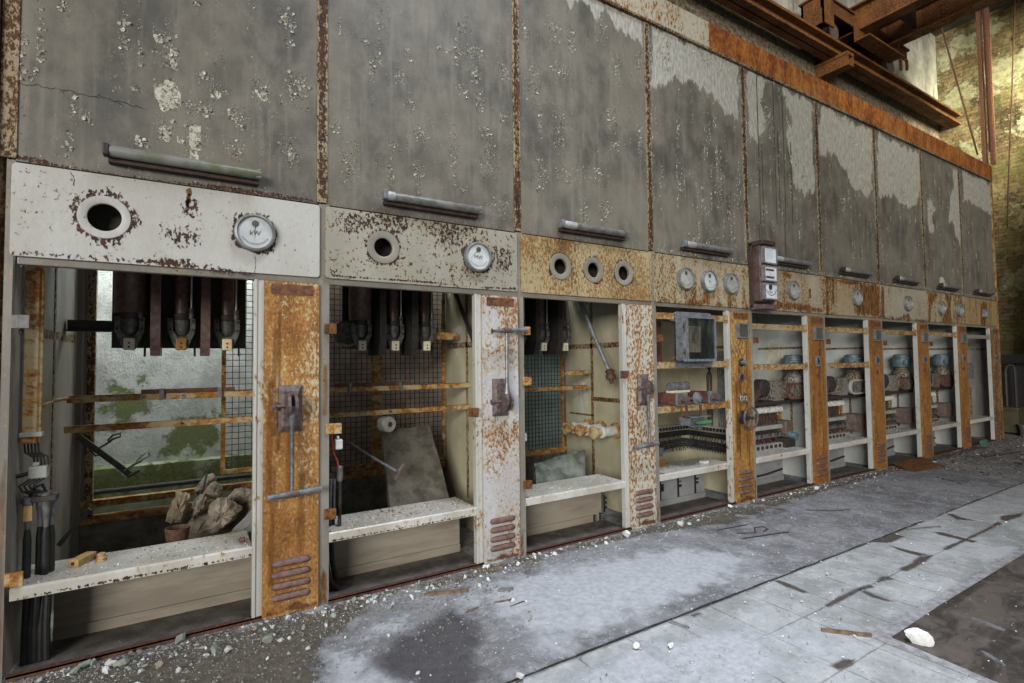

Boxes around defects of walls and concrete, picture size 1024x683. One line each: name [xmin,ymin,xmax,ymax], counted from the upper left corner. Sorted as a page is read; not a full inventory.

crack [20,83,145,109]
rust [12,0,328,276]
peeling [117,1,311,161]
rust [512,0,521,228]
rust [547,251,634,286]
rust [741,68,749,244]
leakage [566,0,936,255]
leakage [948,166,991,245]
rust [267,313,304,585]
leakage [327,614,478,683]